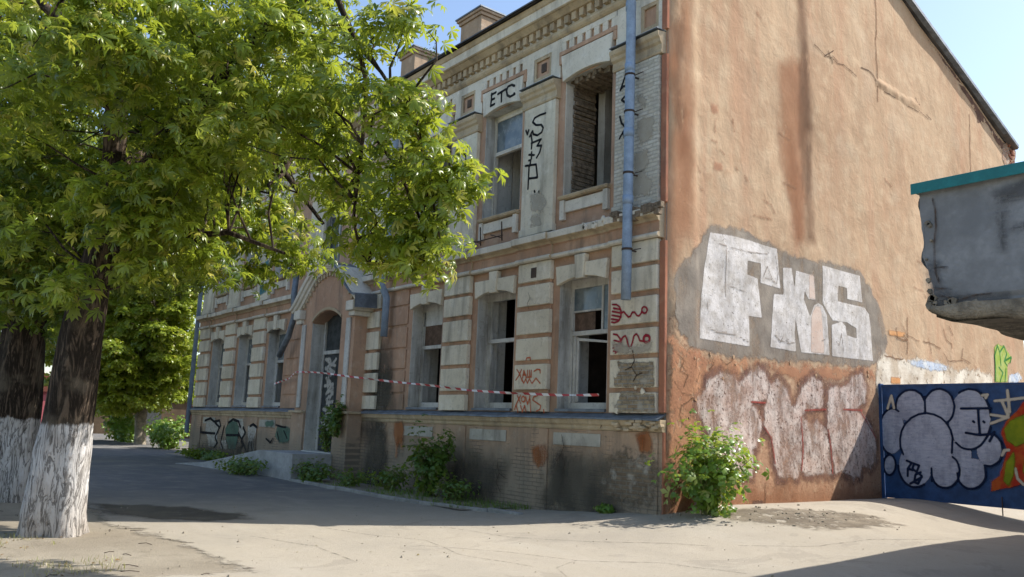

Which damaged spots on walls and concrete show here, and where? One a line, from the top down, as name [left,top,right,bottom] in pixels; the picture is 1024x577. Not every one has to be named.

crack [814,0,928,119]
peeling [582,118,664,230]
damp [782,66,804,236]
spalling [925,258,1008,308]
damp [362,347,392,487]
damp [545,451,616,511]
corrosion [636,432,652,452]
peeling [611,336,992,473]